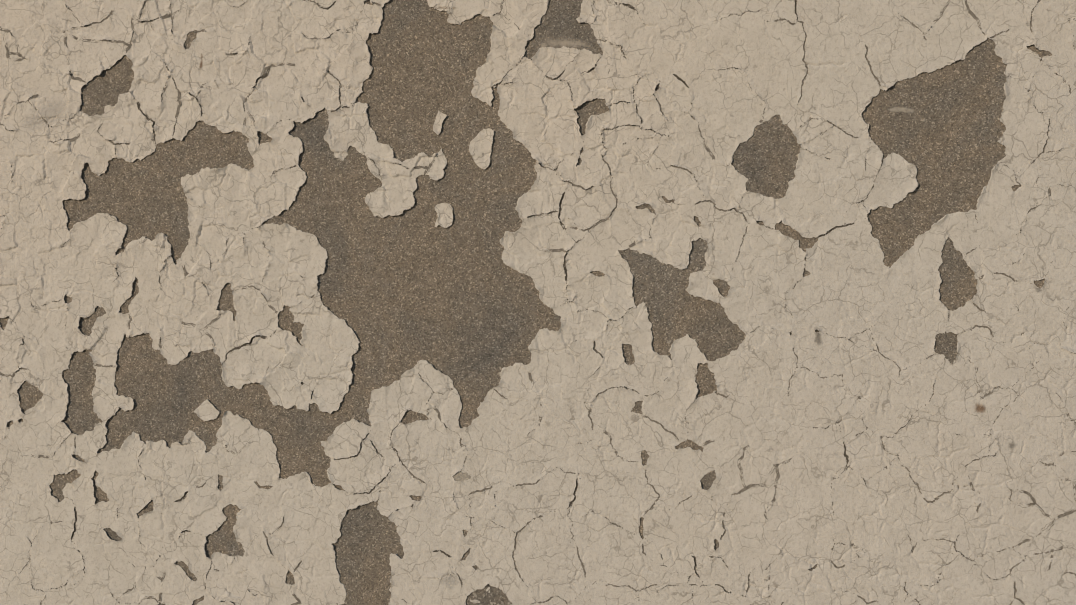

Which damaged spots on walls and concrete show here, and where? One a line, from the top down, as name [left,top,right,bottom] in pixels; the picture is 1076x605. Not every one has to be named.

crack [243,62,350,125]
peeling [727,115,804,199]
crack [720,0,882,237]
peeling [857,38,1010,268]
crack [158,230,278,361]
peeling [57,0,561,491]
peeling [618,216,746,404]
crack [787,76,1076,605]
peeling [934,237,978,311]
crack [334,424,426,526]
crack [20,507,85,605]
peeling [328,501,404,605]